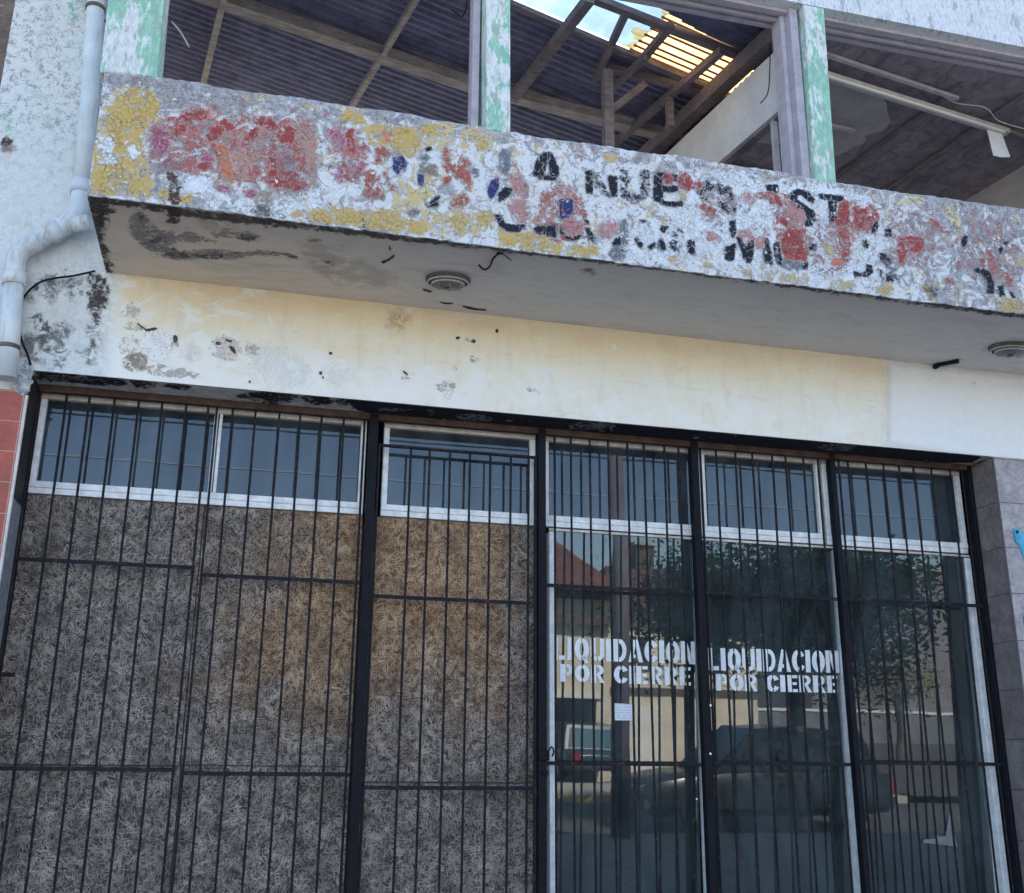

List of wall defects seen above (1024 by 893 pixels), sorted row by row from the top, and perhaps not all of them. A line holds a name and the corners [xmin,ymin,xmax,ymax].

peeling [89,74,1024,312]
peeling [9,301,199,396]
peeling [212,334,260,362]
damp [21,196,1024,366]